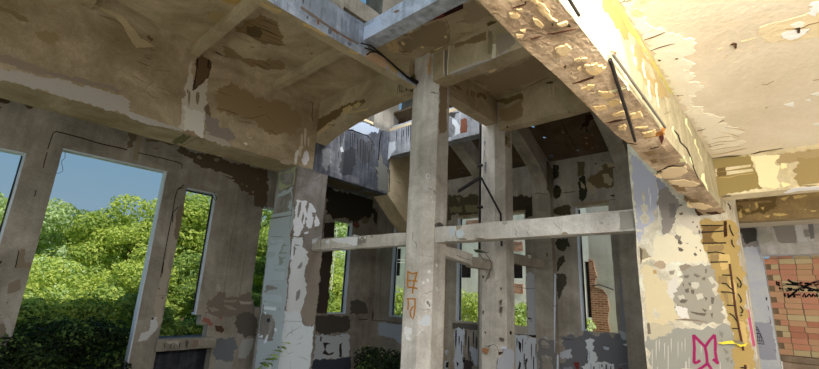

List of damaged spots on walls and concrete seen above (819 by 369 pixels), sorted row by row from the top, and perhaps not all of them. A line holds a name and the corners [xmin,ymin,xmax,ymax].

spalling [222,2,286,70]
peeling [509,0,571,29]
spalling [192,55,212,91]
peeling [555,44,656,137]
spalling [127,132,269,208]
peeling [653,166,700,187]
crack [656,95,783,179]
peeling [751,155,808,201]
peeling [202,199,373,369]
spalling [639,200,788,369]
peeling [444,327,503,369]
peeling [500,331,547,369]